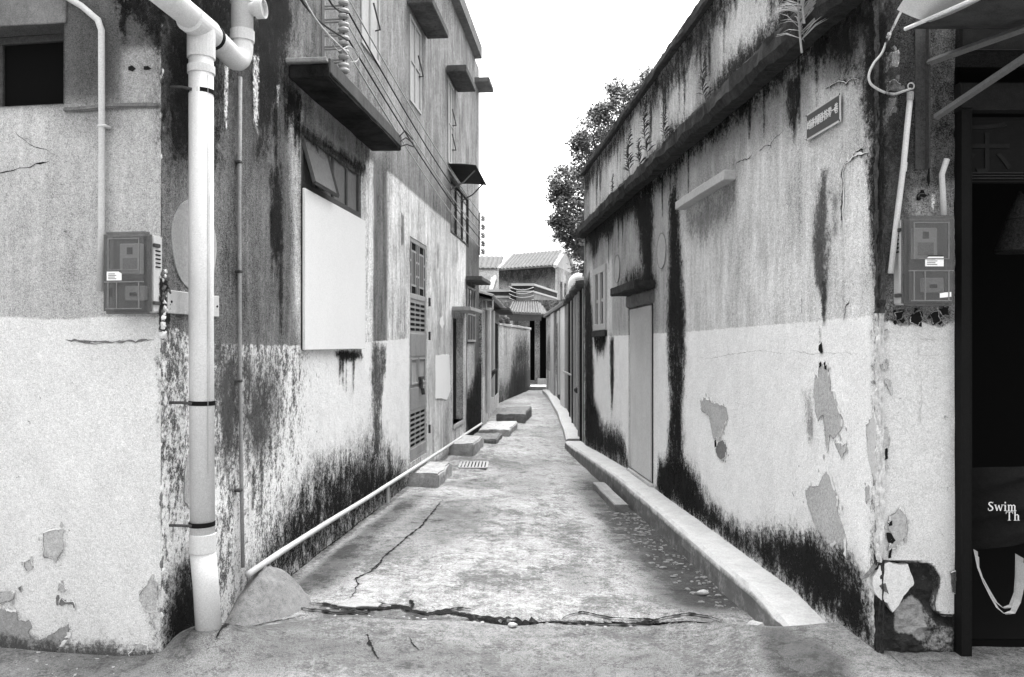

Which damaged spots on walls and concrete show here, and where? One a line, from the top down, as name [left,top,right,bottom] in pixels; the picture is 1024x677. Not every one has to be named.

crack [0,136,57,173]
leakage [115,0,188,163]
leakage [191,0,231,37]
leakage [214,0,366,333]
crack [65,337,152,345]
leakage [584,0,895,648]
leakage [262,341,409,576]
peeling [700,393,729,462]
peeling [803,342,850,559]
peeling [0,585,71,651]
crack [215,502,719,658]
spalling [860,507,956,653]